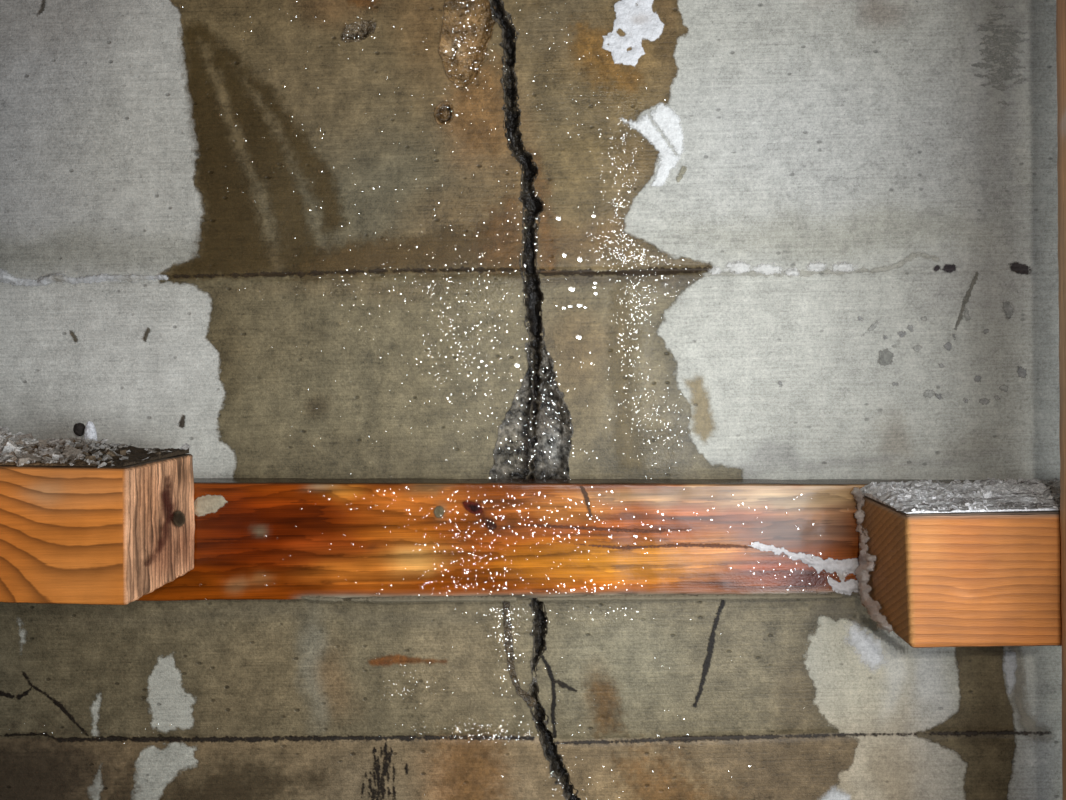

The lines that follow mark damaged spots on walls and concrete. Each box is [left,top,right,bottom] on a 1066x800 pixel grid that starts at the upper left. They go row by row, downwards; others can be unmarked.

corrosion [576,25,640,90]
water stain [0,0,939,479]
crack [490,0,545,479]
crack [0,672,89,736]
water stain [0,477,1060,800]
crack [503,598,580,800]
crack [693,600,725,708]